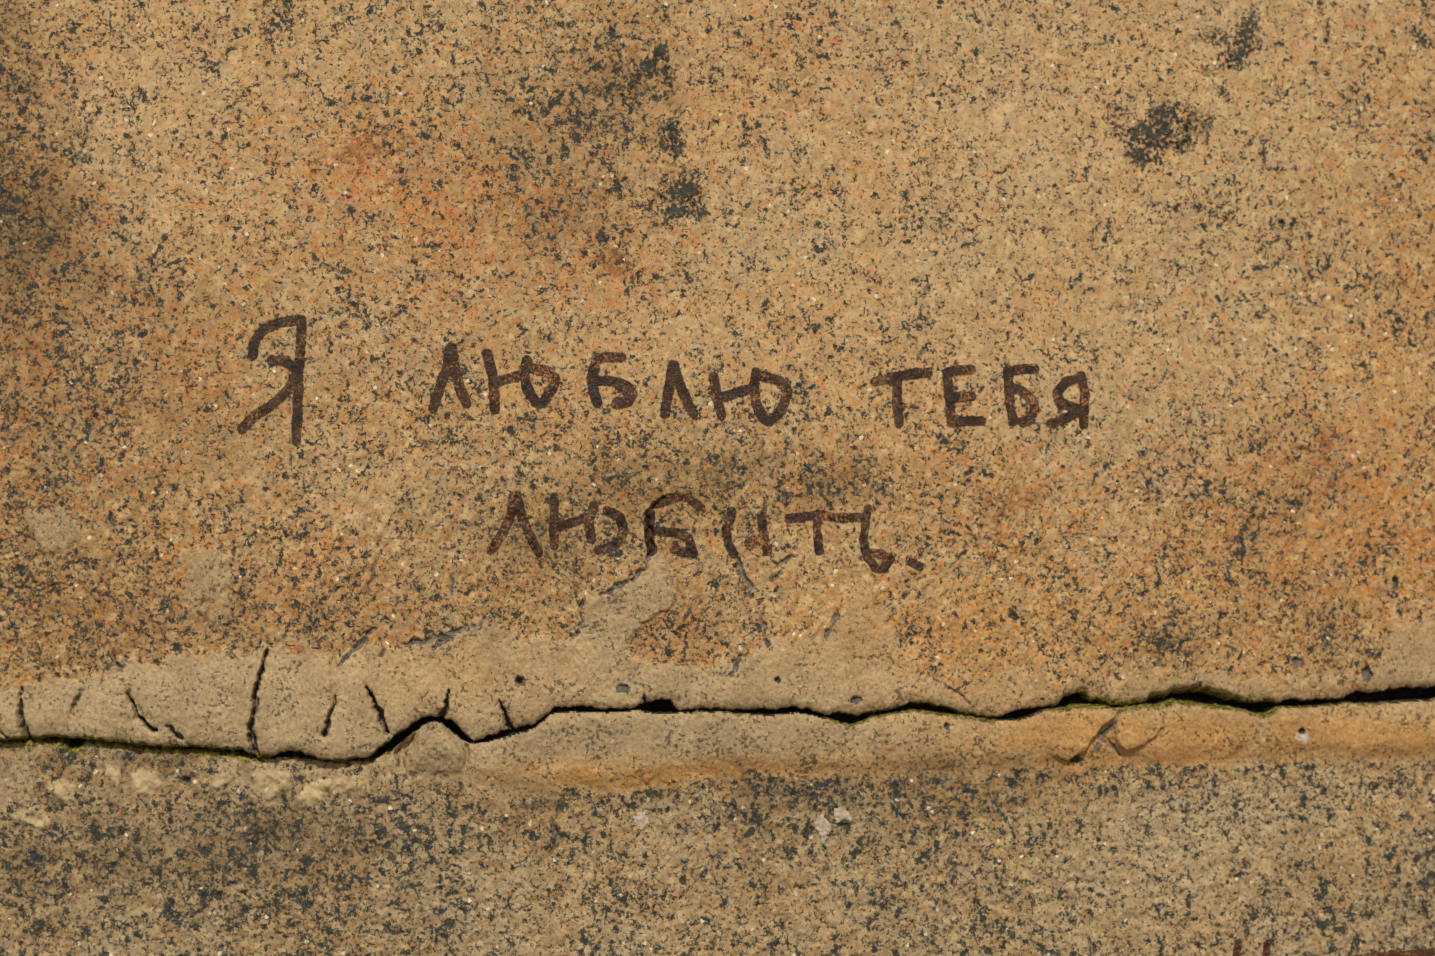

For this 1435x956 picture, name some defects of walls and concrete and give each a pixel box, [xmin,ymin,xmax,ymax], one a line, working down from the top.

crack [0,693,86,745]
crack [113,555,1435,761]